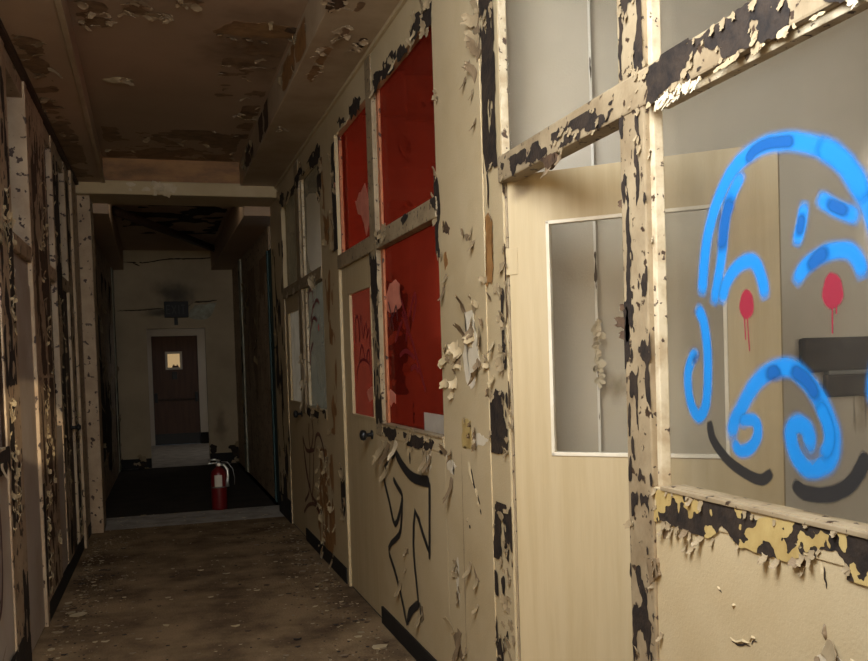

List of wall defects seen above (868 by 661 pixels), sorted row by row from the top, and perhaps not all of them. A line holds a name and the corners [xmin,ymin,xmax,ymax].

peeling [11,34,67,120]
peeling [69,0,204,31]
peeling [101,100,268,178]
peeling [276,0,432,253]
peeling [0,66,18,389]
peeling [29,116,84,596]
peeling [430,166,512,458]
peeling [460,0,868,586]
peeling [11,569,32,661]
peeling [492,501,515,661]
peeling [630,547,663,661]
peeling [814,639,842,661]